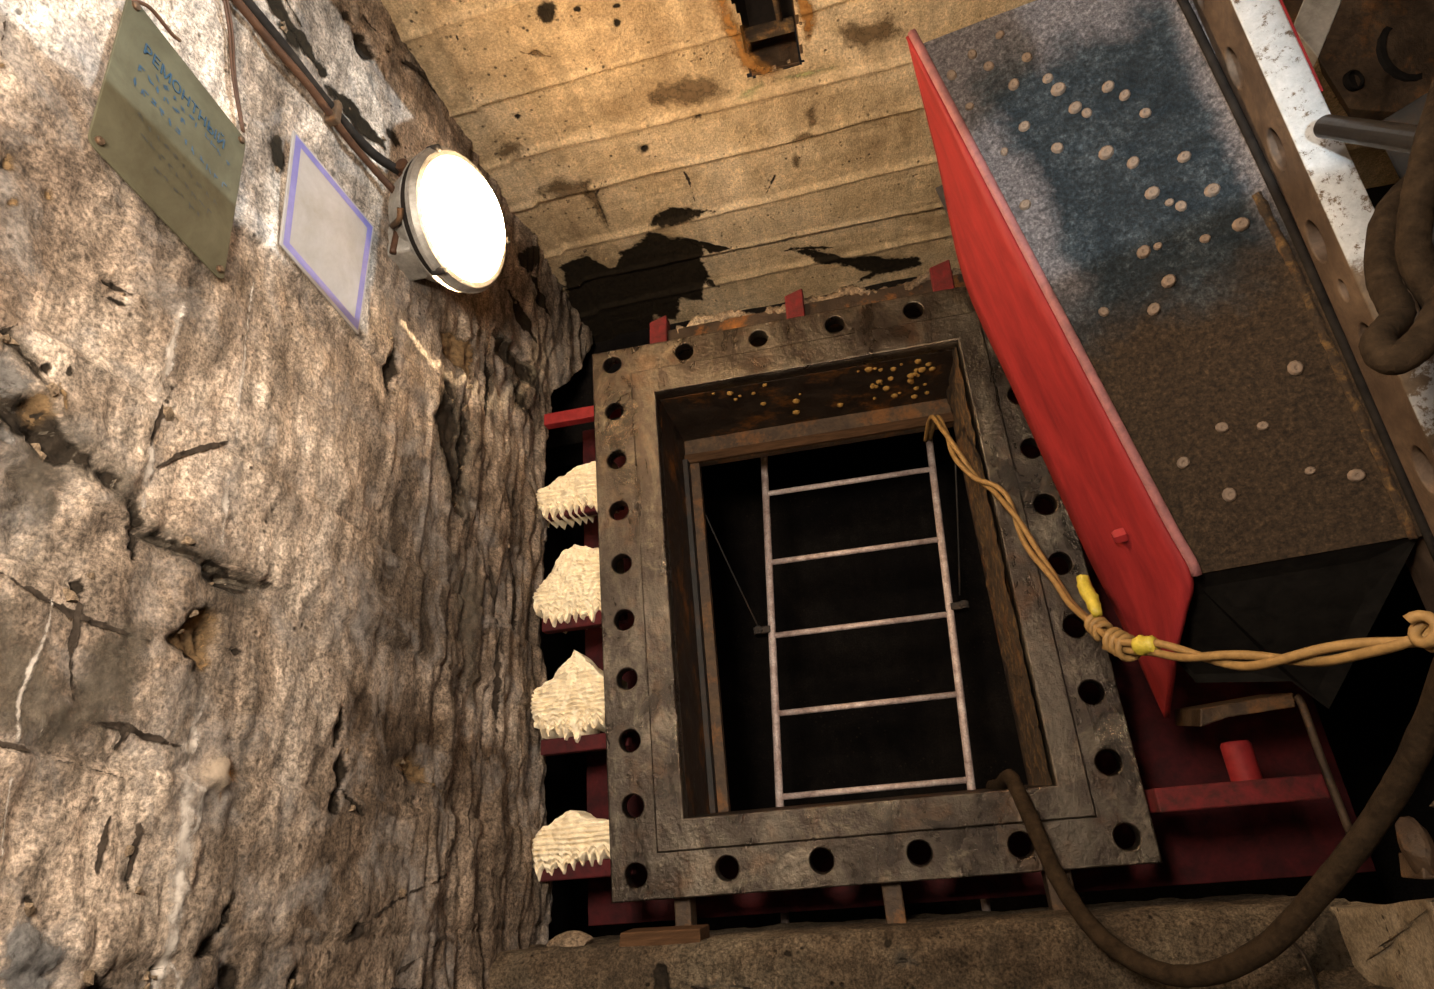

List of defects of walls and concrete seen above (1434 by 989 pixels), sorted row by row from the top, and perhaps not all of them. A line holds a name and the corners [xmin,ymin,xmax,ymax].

corrosion [715,0,790,76]
corrosion [795,0,815,39]
damp [841,19,900,48]
damp [651,77,718,105]
crack [0,329,272,603]
crack [0,571,182,778]